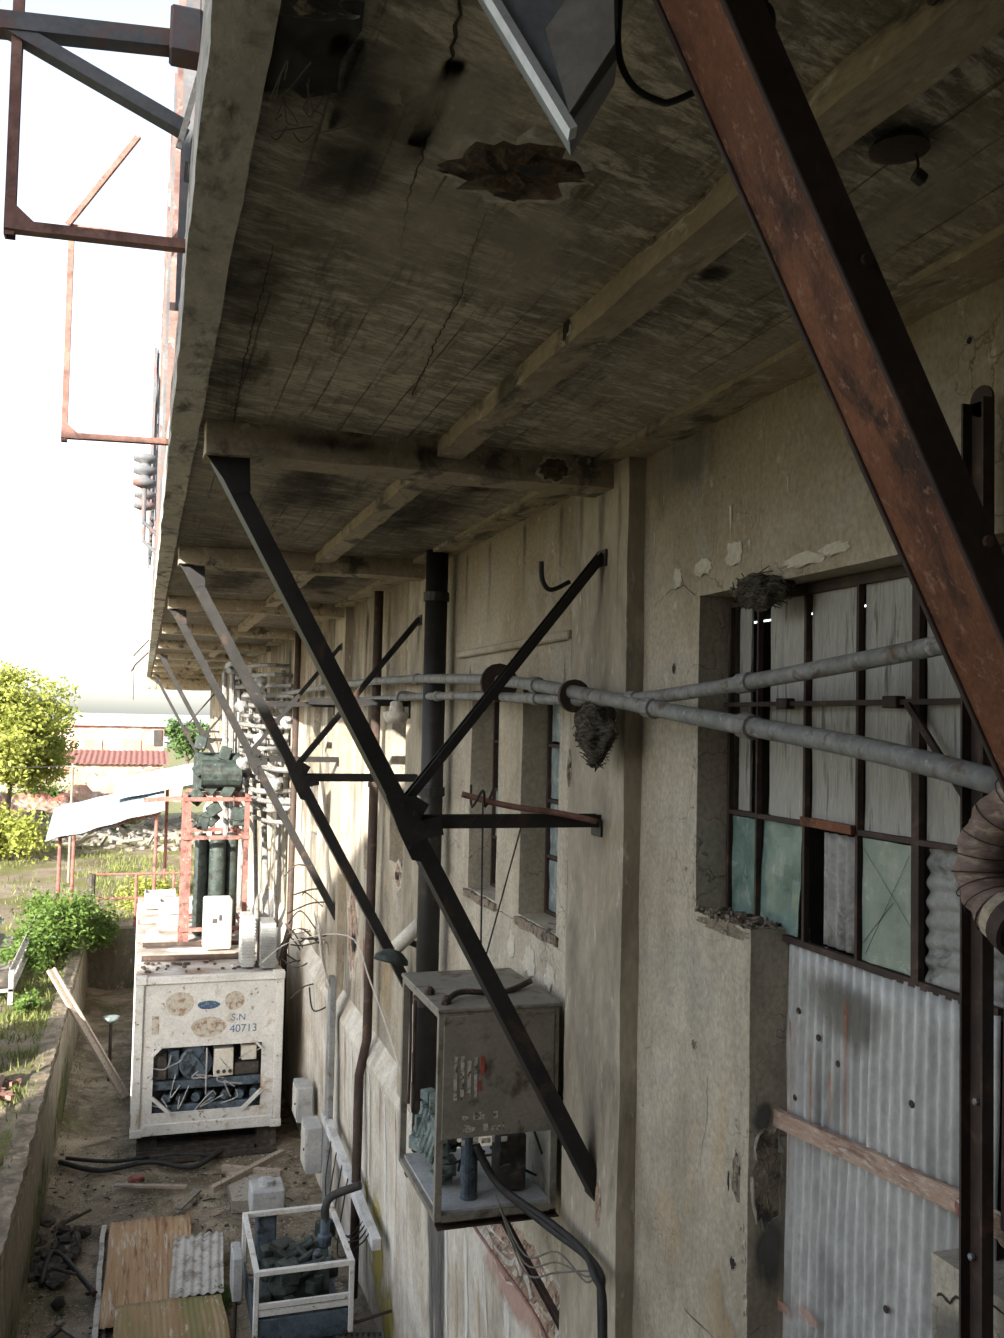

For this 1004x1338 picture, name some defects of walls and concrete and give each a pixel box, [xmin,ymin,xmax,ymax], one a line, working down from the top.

crack [399,0,462,249]
leakage [312,147,382,200]
spalling [437,124,593,204]
crack [233,244,273,423]
crack [412,214,486,396]
spalling [535,454,571,485]
peeling [672,540,743,589]
peeling [780,540,850,568]
leakage [754,1103,771,1132]
leakage [756,1222,781,1286]